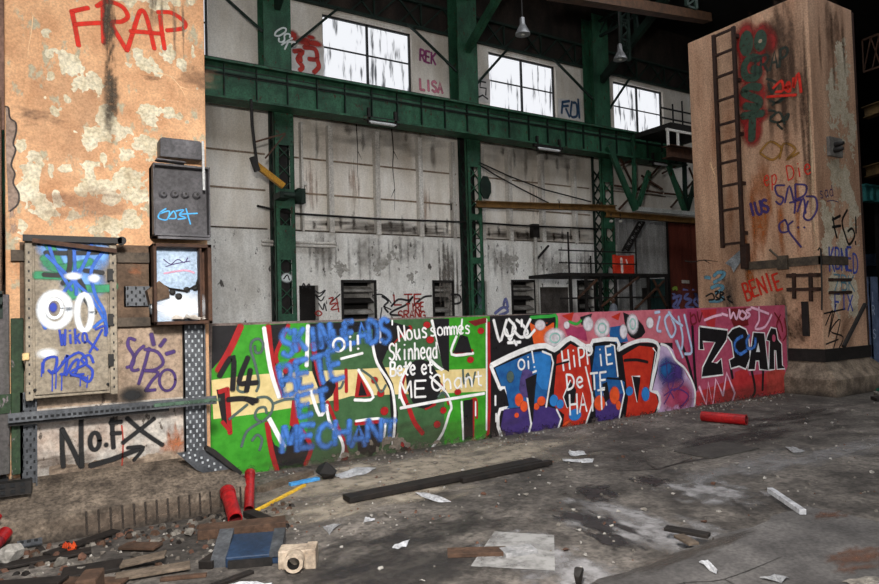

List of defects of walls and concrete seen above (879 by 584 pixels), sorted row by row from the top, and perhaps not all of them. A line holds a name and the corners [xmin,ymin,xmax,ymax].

peeling [5,29,196,240]
damp [103,0,118,126]
damp [439,246,458,314]
peeling [812,37,861,319]